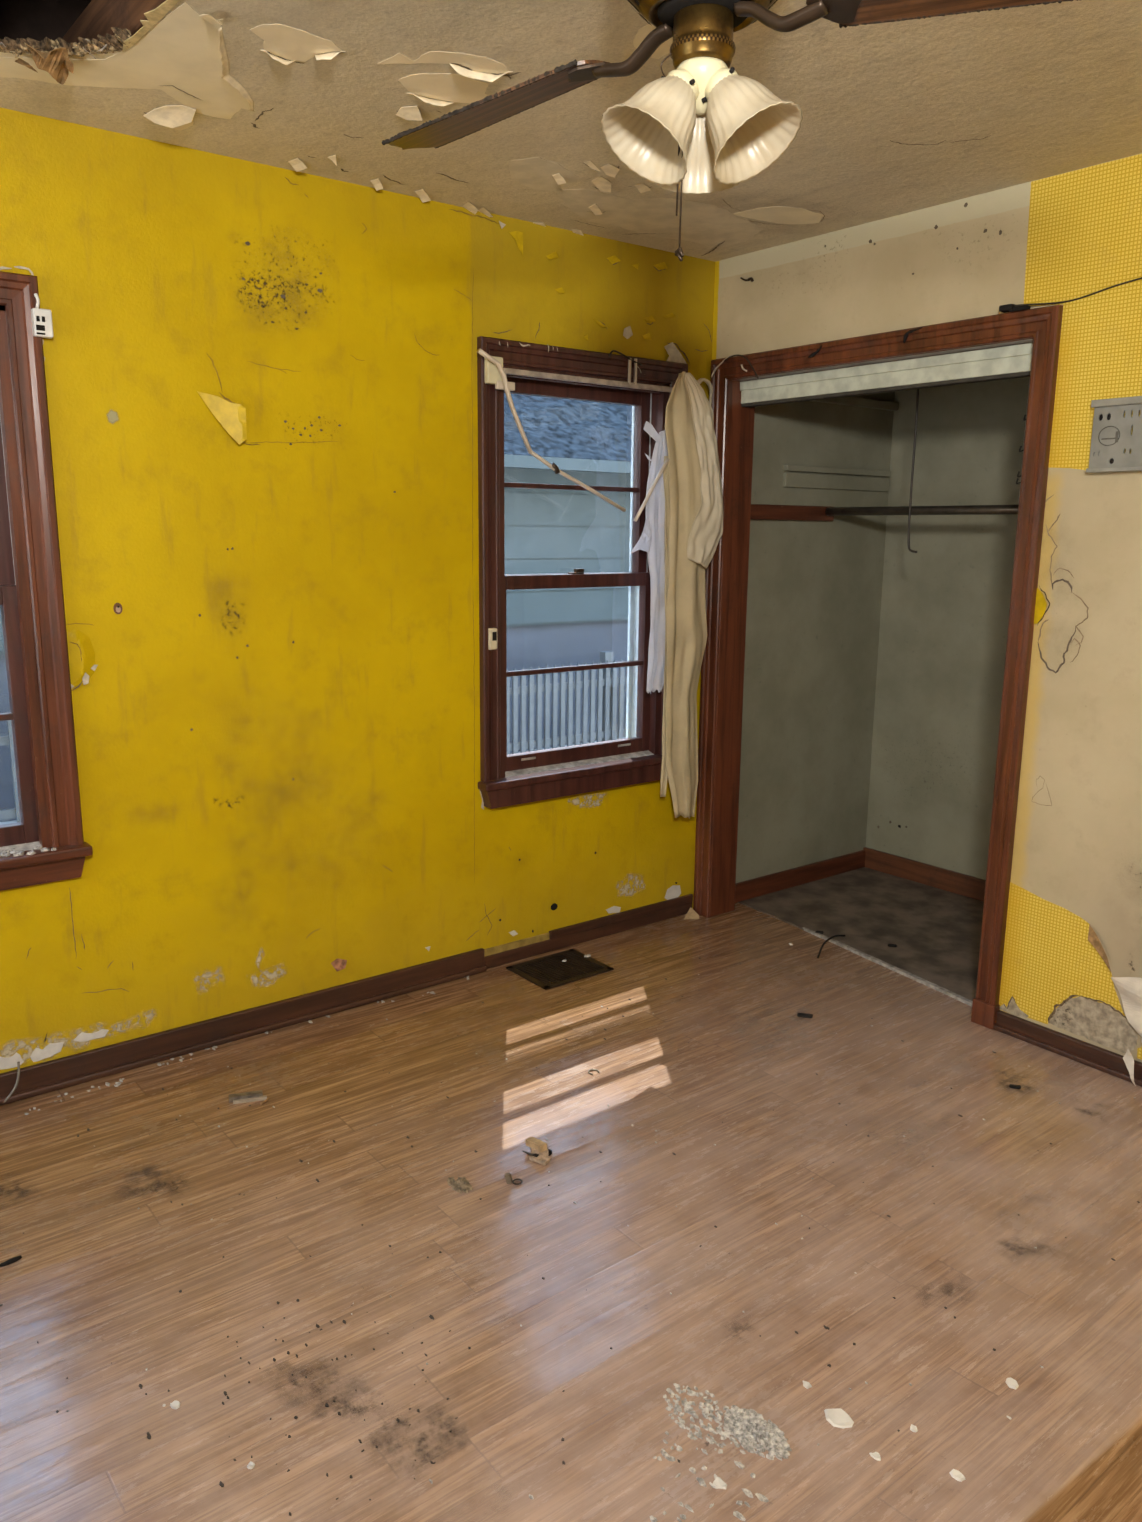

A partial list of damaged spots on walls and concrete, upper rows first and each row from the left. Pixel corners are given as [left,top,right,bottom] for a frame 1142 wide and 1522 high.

peeling [0,0,254,131]
peeling [250,24,347,65]
peeling [378,51,521,121]
peeling [584,161,651,215]
damp [239,236,324,330]
peeling [197,354,260,445]
peeling [1034,586,1050,626]
flaking render [0,1013,153,1070]
flaking render [1000,996,1028,1018]
flaking render [1048,995,1138,1054]